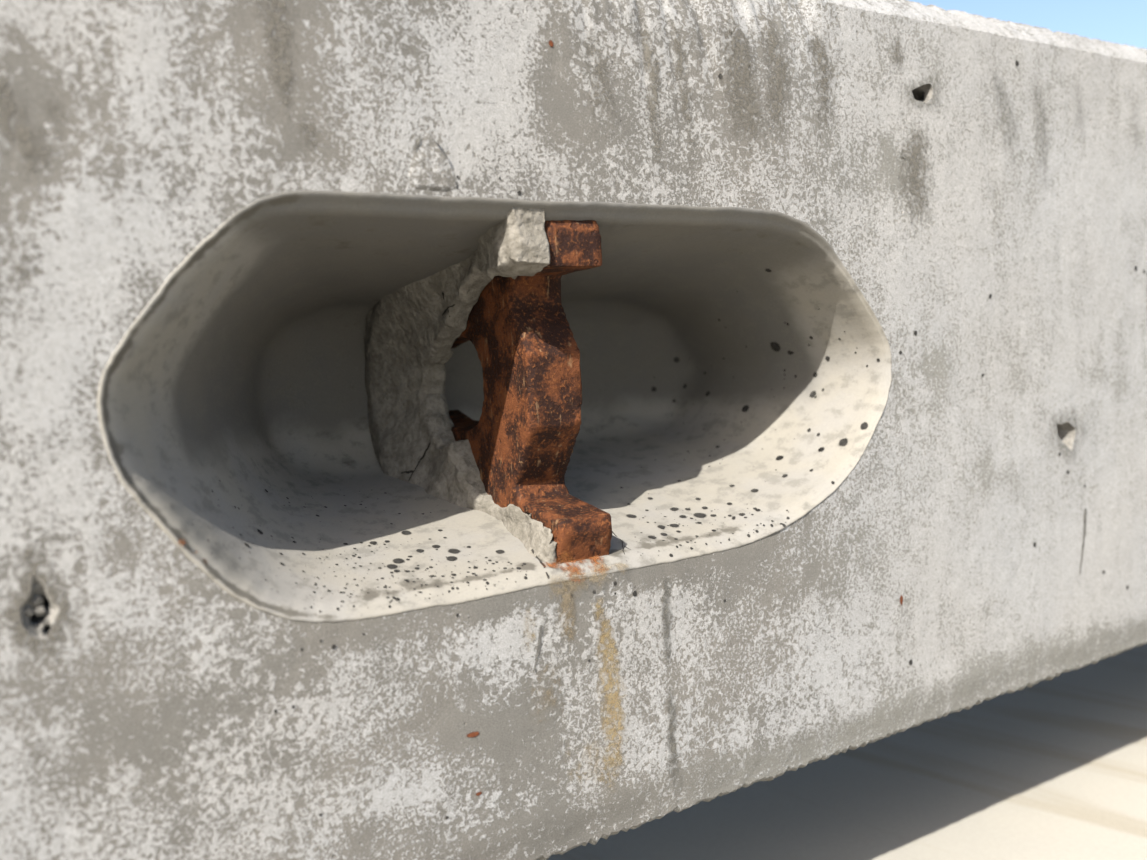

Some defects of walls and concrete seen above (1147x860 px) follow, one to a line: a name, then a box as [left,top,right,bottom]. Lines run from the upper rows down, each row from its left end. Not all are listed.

spalling [280,510,527,612]
rust [547,551,608,638]
rust [596,603,623,764]